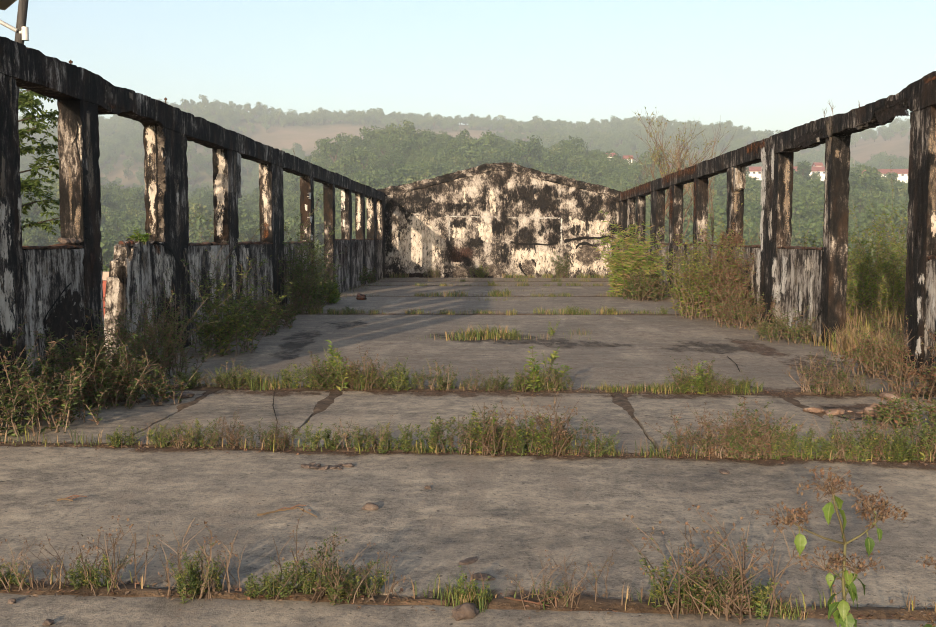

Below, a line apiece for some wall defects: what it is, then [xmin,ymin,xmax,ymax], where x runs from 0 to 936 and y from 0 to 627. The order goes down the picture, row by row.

flaking render [0,154,15,334]
flaking render [145,124,167,234]
flaking render [215,149,225,236]
leakage [385,187,437,256]
leakage [448,203,470,228]
leakage [491,184,617,264]
flaking render [751,147,778,296]
flaking render [928,166,936,237]
spalling [37,283,89,360]
flaking render [100,241,175,343]
flaking render [772,256,817,332]
flaking render [915,297,935,358]